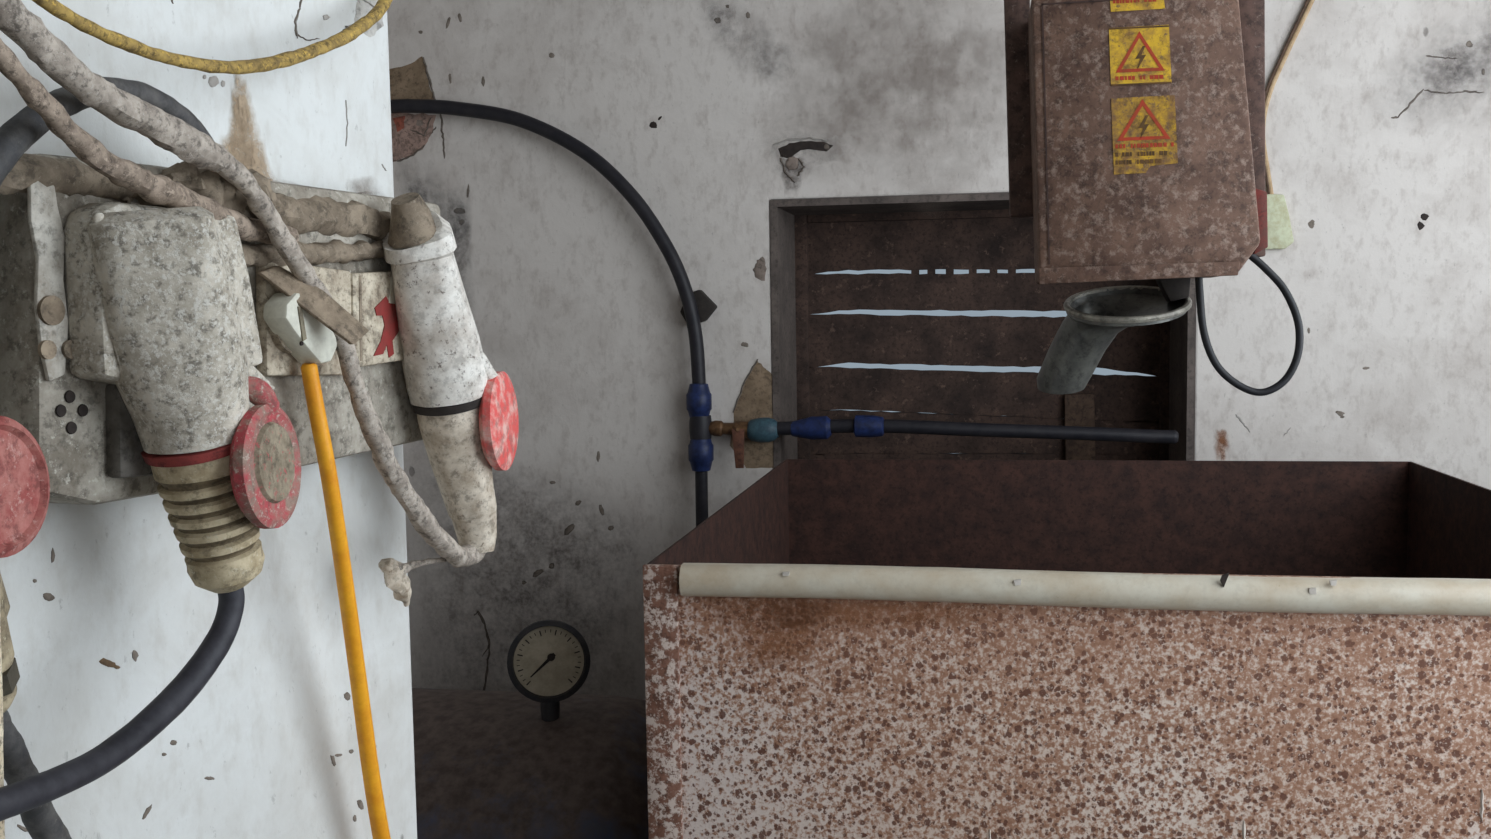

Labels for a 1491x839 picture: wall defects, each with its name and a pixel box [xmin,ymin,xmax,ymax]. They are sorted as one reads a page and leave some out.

crack [294,0,360,41]
spalling [389,57,452,162]
spalling [730,342,774,468]